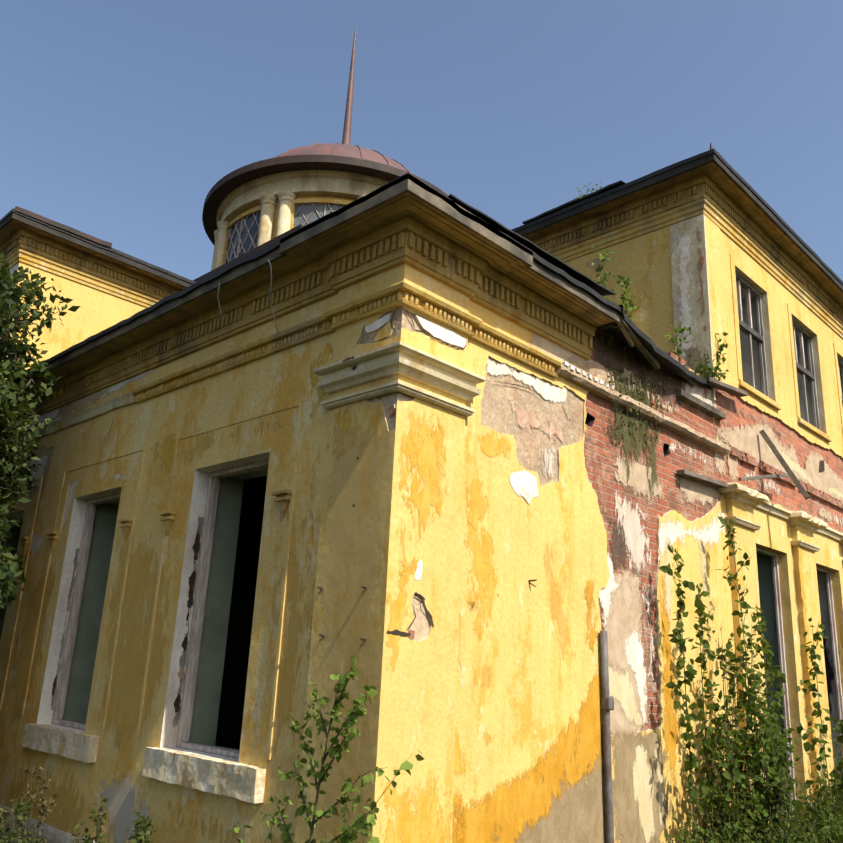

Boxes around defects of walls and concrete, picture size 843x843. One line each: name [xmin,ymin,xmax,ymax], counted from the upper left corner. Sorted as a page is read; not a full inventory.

spalling [357,306,467,351]
flaking render [481,326,843,738]
peeling [181,532,200,653]
spalling [387,592,434,642]
peeling [414,560,423,580]